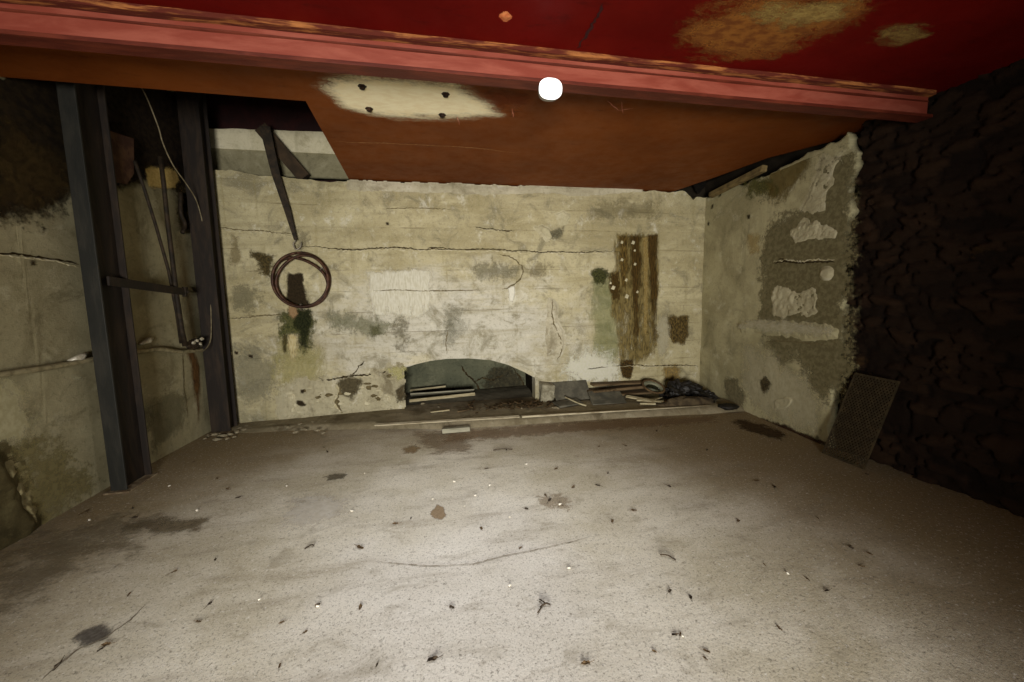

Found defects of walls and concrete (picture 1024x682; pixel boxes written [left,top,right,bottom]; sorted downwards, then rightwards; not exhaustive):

peeling [674,0,871,63]
peeling [880,24,930,46]
peeling [325,76,498,119]
peeling [790,154,842,243]
crack [0,252,79,267]
crack [219,227,617,290]
crack [775,257,834,265]
peeling [771,285,818,319]
water stain [668,315,689,345]
water stain [282,334,299,361]
crack [318,361,404,413]
spalling [760,376,771,393]